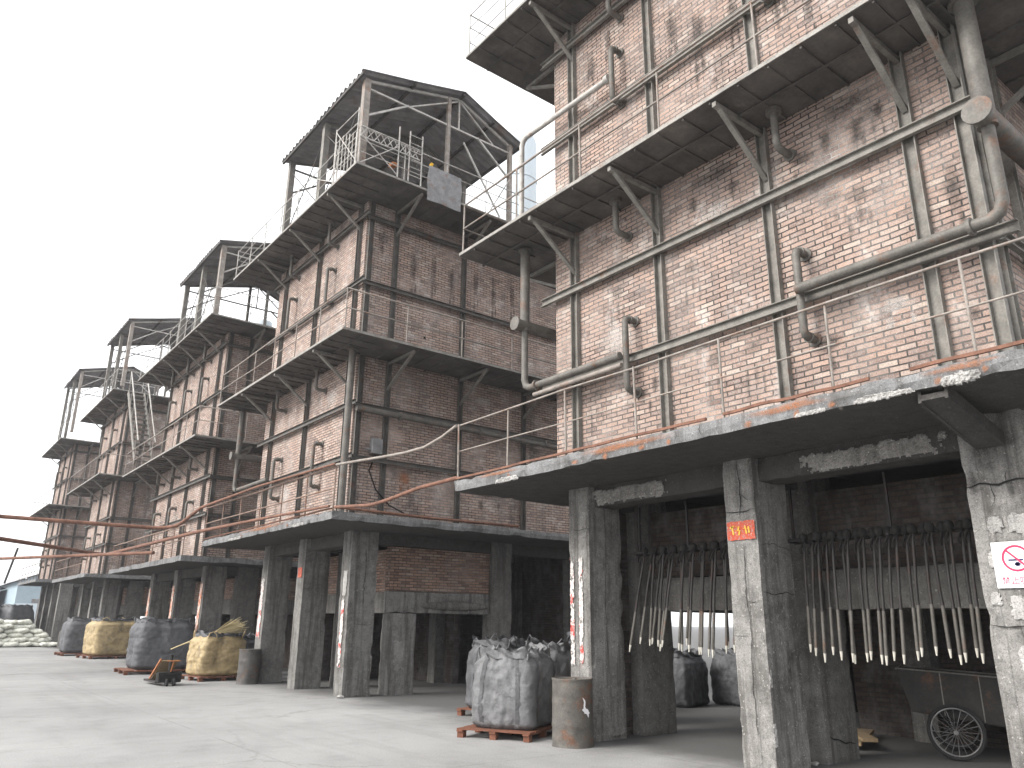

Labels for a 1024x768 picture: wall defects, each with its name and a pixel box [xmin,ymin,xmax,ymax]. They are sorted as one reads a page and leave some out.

spalling [940,369,981,387]
spalling [799,431,948,474]
spalling [593,479,668,506]
crack [967,472,1024,506]
peeling [987,512,1024,535]
peeling [991,592,1024,620]